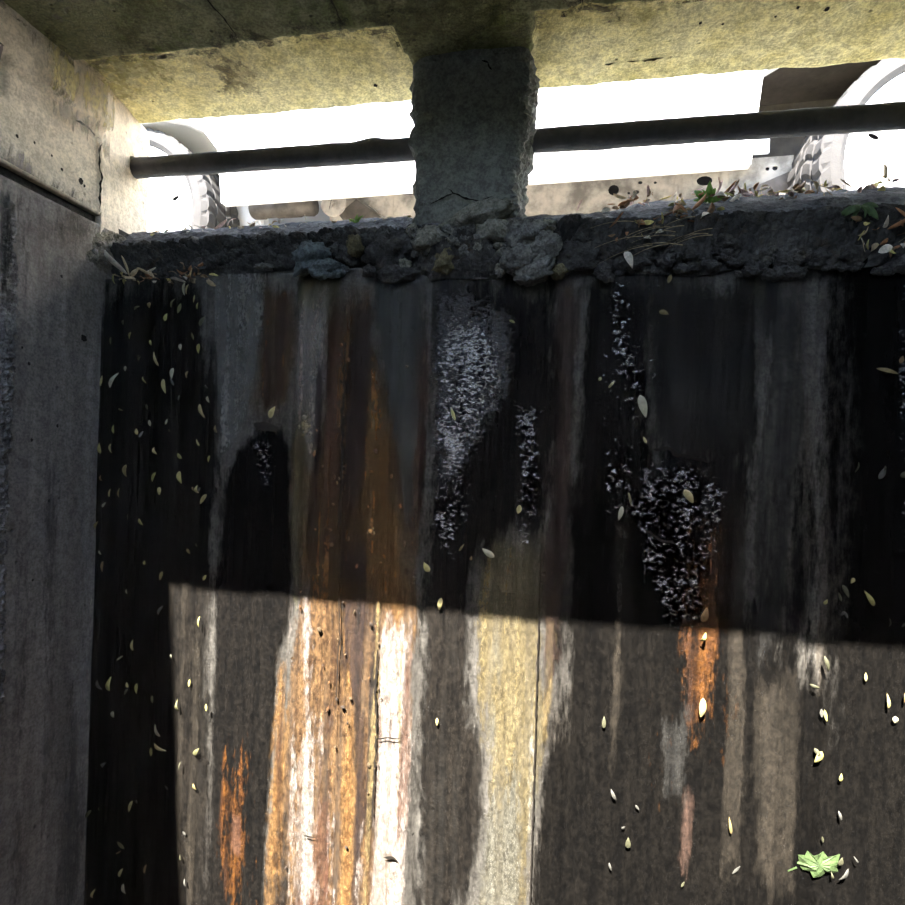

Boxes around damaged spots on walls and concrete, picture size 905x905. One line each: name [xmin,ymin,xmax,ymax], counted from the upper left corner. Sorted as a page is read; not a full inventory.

damp [65,272,326,905]
rust [220,748,248,905]
rust [264,287,428,905]
damp [340,248,905,905]